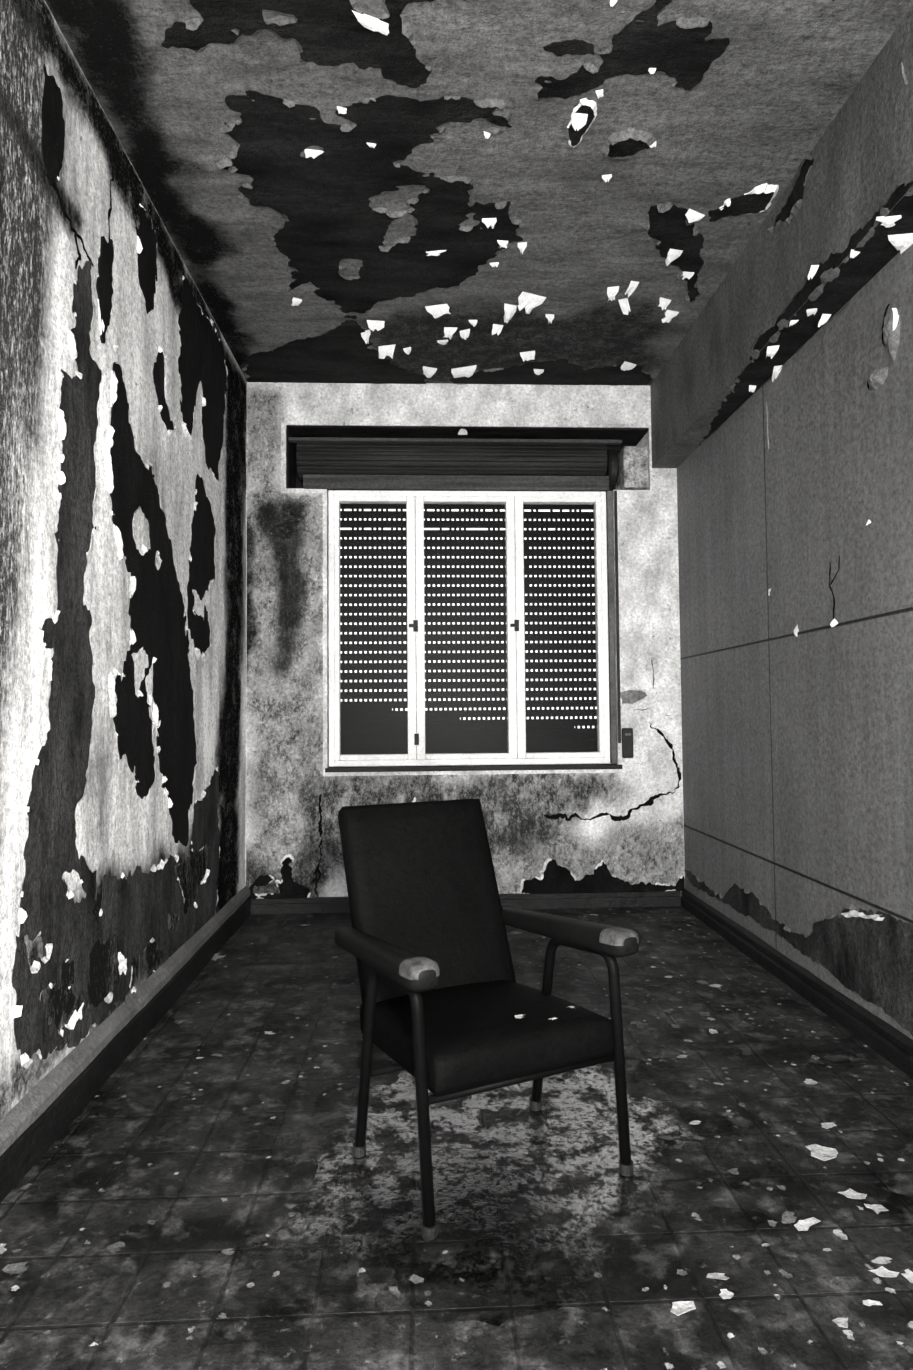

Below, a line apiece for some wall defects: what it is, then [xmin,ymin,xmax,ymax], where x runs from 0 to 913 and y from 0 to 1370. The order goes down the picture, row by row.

peeling [532,0,730,148]
peeling [643,154,814,323]
peeling [697,180,913,446]
peeling [11,0,656,1069]
leakage [0,0,684,1032]
crack [544,660,681,821]
spalling [520,858,913,1036]
leakage [0,1052,57,1119]